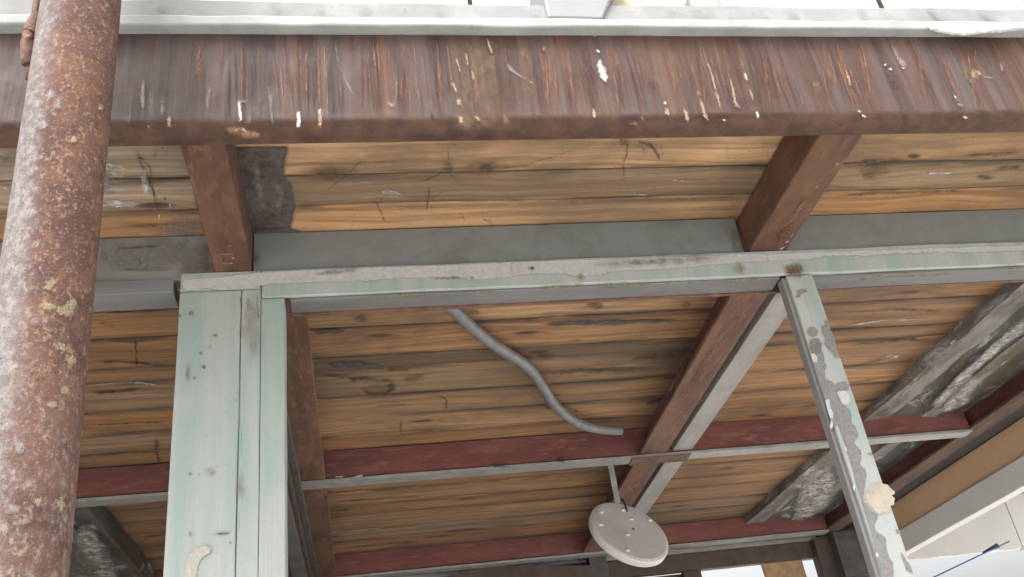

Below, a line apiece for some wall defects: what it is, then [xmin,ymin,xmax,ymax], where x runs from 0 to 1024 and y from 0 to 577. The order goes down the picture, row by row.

corrosion [220,45,342,136]
corrosion [361,39,507,123]
corrosion [527,47,600,118]
corrosion [609,44,804,121]
corrosion [822,45,870,117]
water stain [226,147,300,240]
water stain [922,324,1023,411]
water stain [774,453,836,520]
peeling [807,320,912,577]